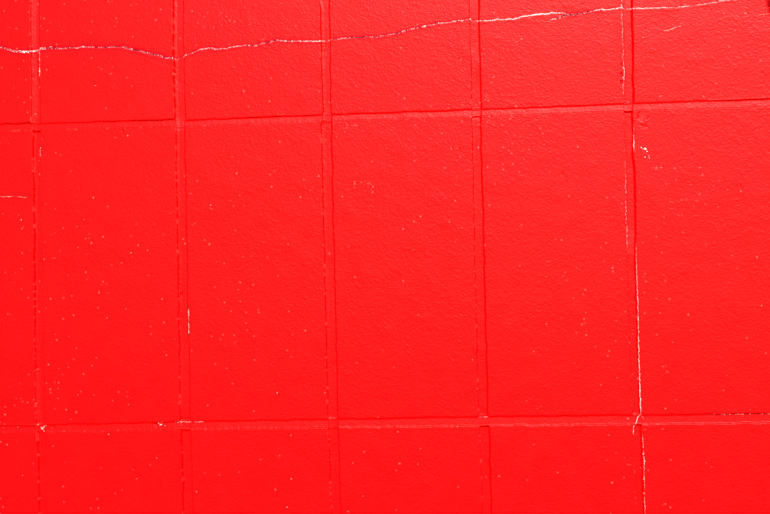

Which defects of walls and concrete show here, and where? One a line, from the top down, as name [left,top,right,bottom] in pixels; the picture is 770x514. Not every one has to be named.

crack [0,0,770,75]